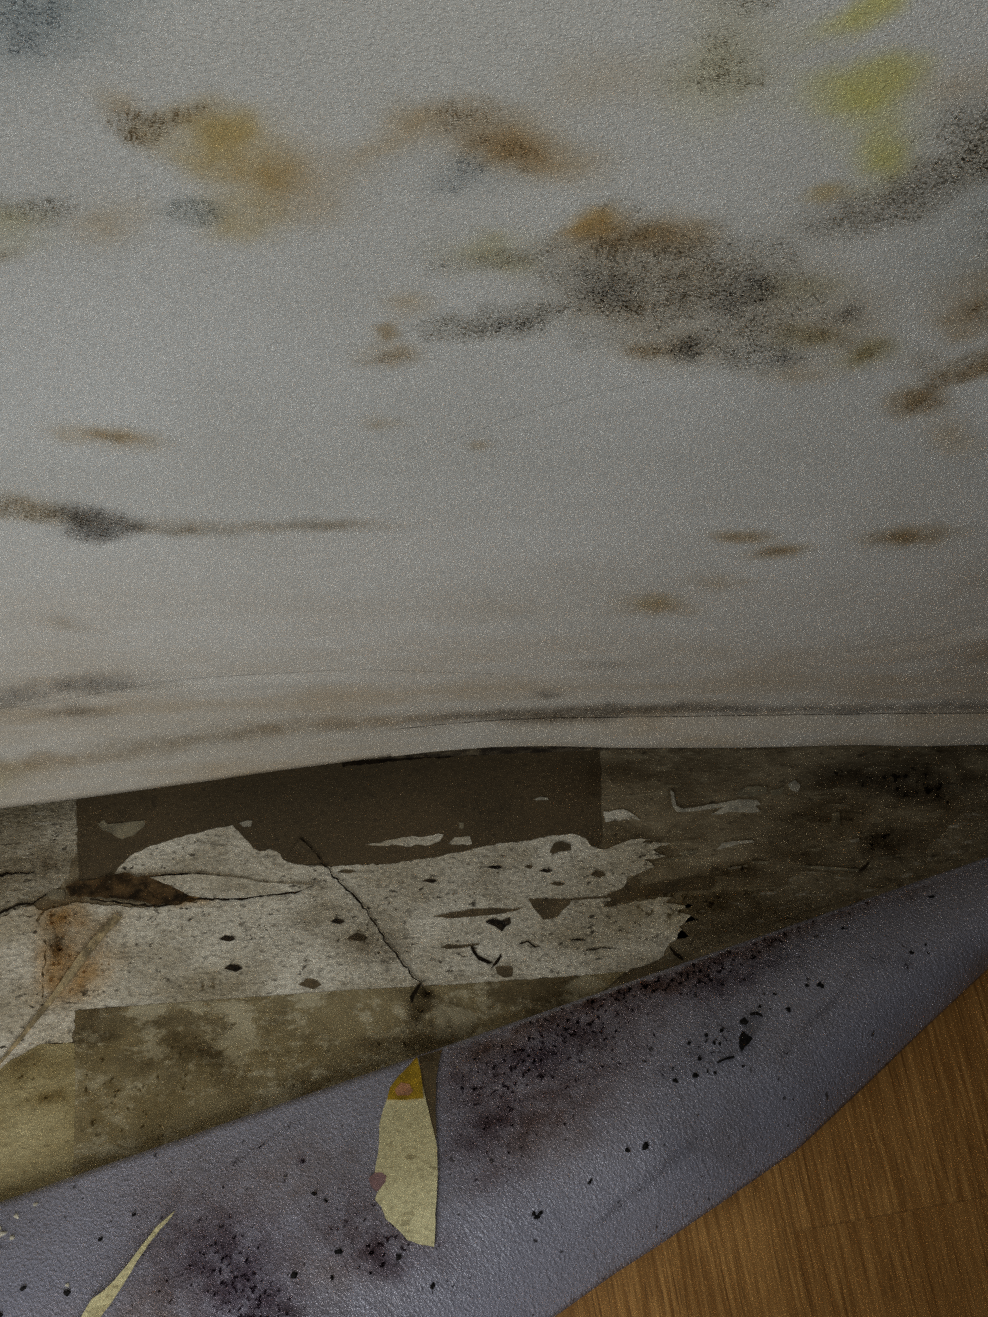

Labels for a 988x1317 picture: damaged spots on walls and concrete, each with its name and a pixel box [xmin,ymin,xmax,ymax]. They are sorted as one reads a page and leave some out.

leakage [690,35,760,92]
leakage [109,106,207,147]
leakage [806,107,988,237]
leakage [423,220,880,375]
leakage [0,496,142,545]
peeling [98,820,145,839]
crack [0,872,46,914]
peeling [434,841,717,931]
crack [90,838,426,1003]
peeling [331,918,368,942]
peeling [298,979,321,989]
peeling [441,943,513,978]